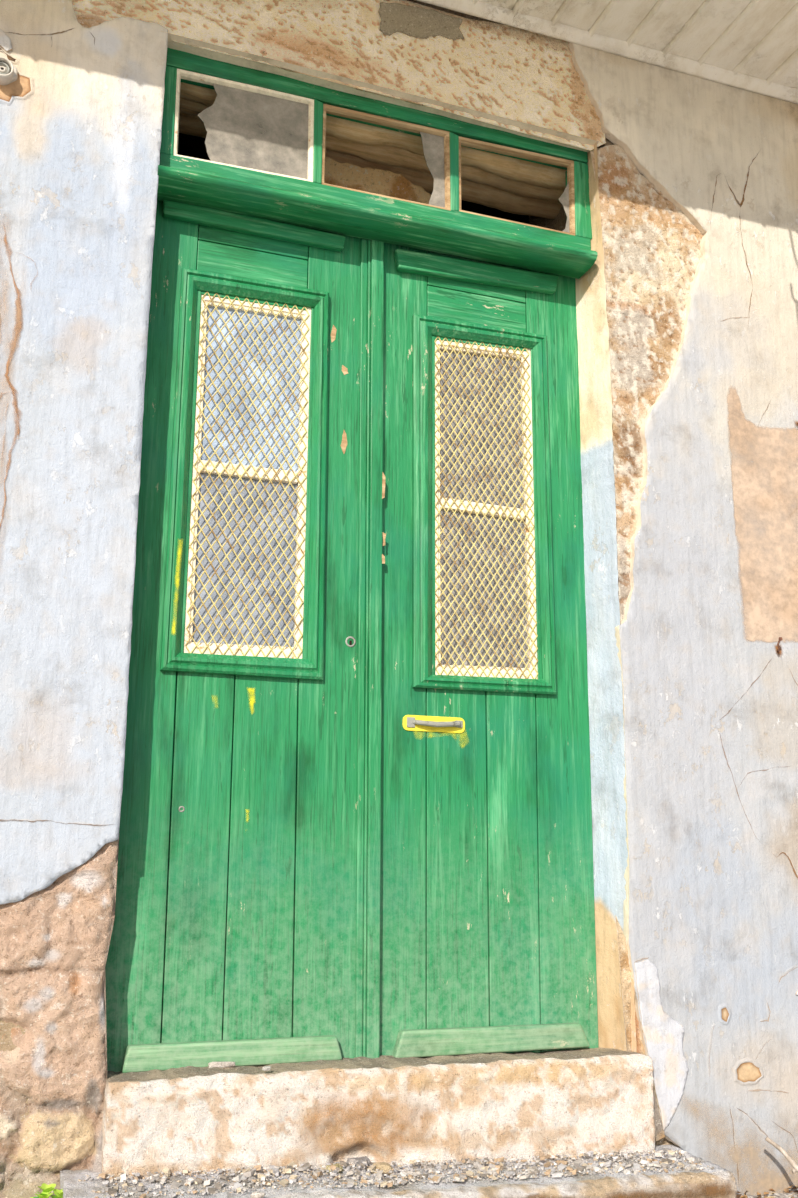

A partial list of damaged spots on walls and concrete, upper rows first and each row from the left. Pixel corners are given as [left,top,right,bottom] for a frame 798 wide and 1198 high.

flaking render [0,29,35,106]
flaking render [72,0,703,624]
crack [710,152,759,324]
peeling [727,388,798,642]
crack [0,818,102,826]
crack [719,660,798,835]
crack [779,851,798,878]
flaking render [77,917,714,1198]